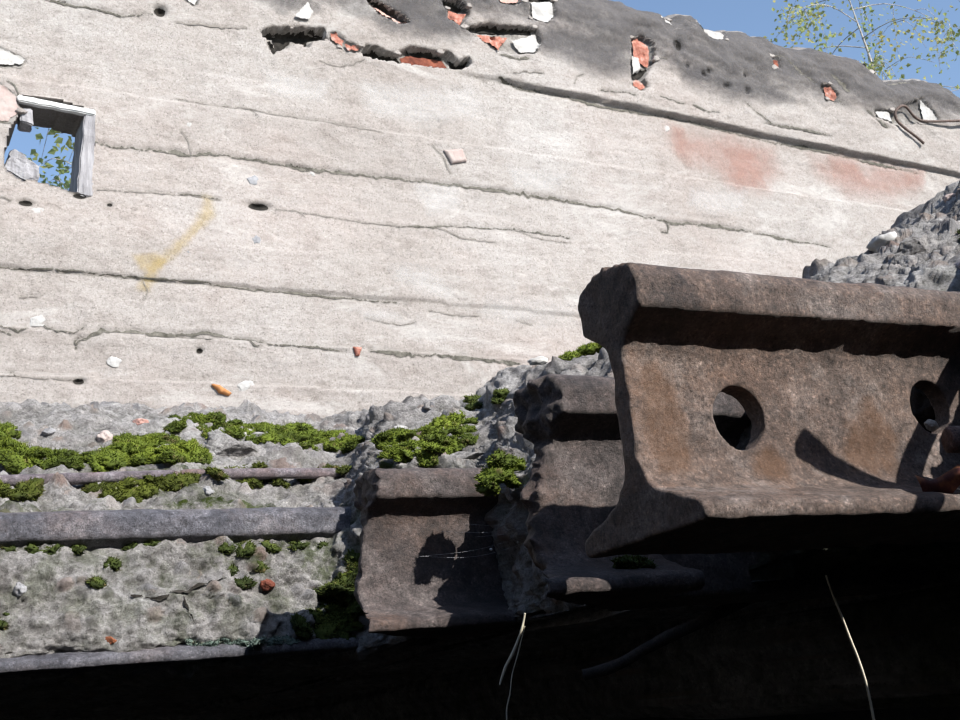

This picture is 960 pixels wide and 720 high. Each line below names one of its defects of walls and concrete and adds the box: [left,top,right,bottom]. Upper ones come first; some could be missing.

spalling [0,46,26,69]
spalling [259,0,471,70]
spalling [442,0,558,54]
spalling [630,35,660,91]
damp [381,0,960,113]
spalling [0,83,28,124]
spalling [874,96,939,125]